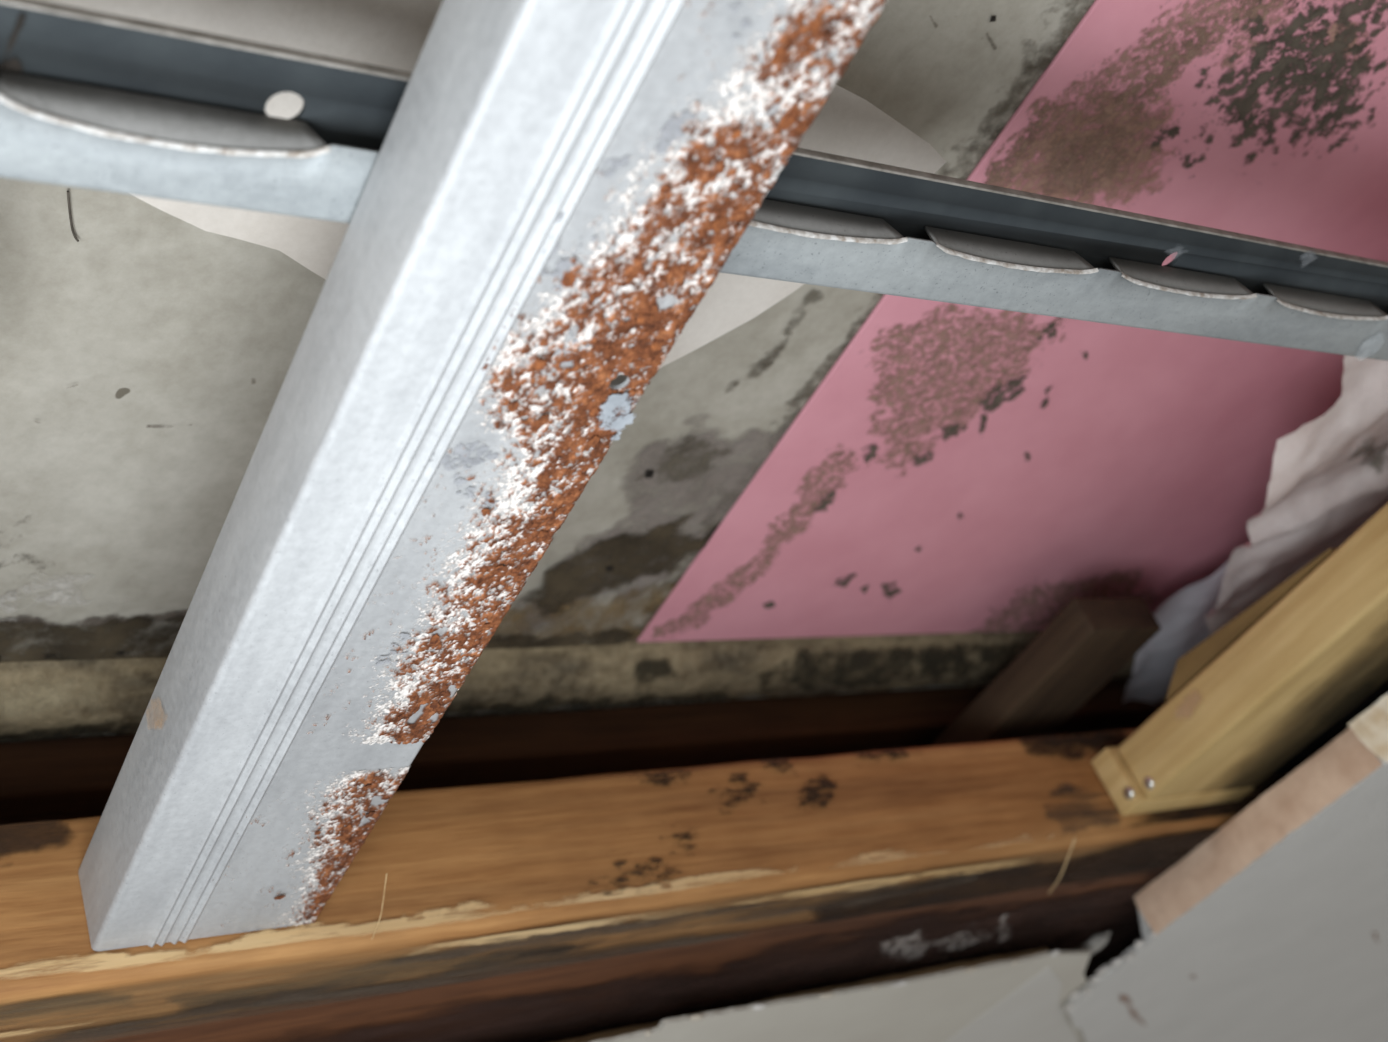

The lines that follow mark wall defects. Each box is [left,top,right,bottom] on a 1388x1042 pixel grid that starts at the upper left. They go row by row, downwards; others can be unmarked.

water stain [985,0,1388,206]
corrosion [307,0,887,745]
water stain [805,291,820,304]
water stain [484,304,1065,649]
water stain [0,590,187,663]
water stain [760,570,1160,693]
water stain [0,722,135,743]
water stain [0,821,69,856]
corrosion [260,765,411,926]
water stain [37,641,1388,1042]